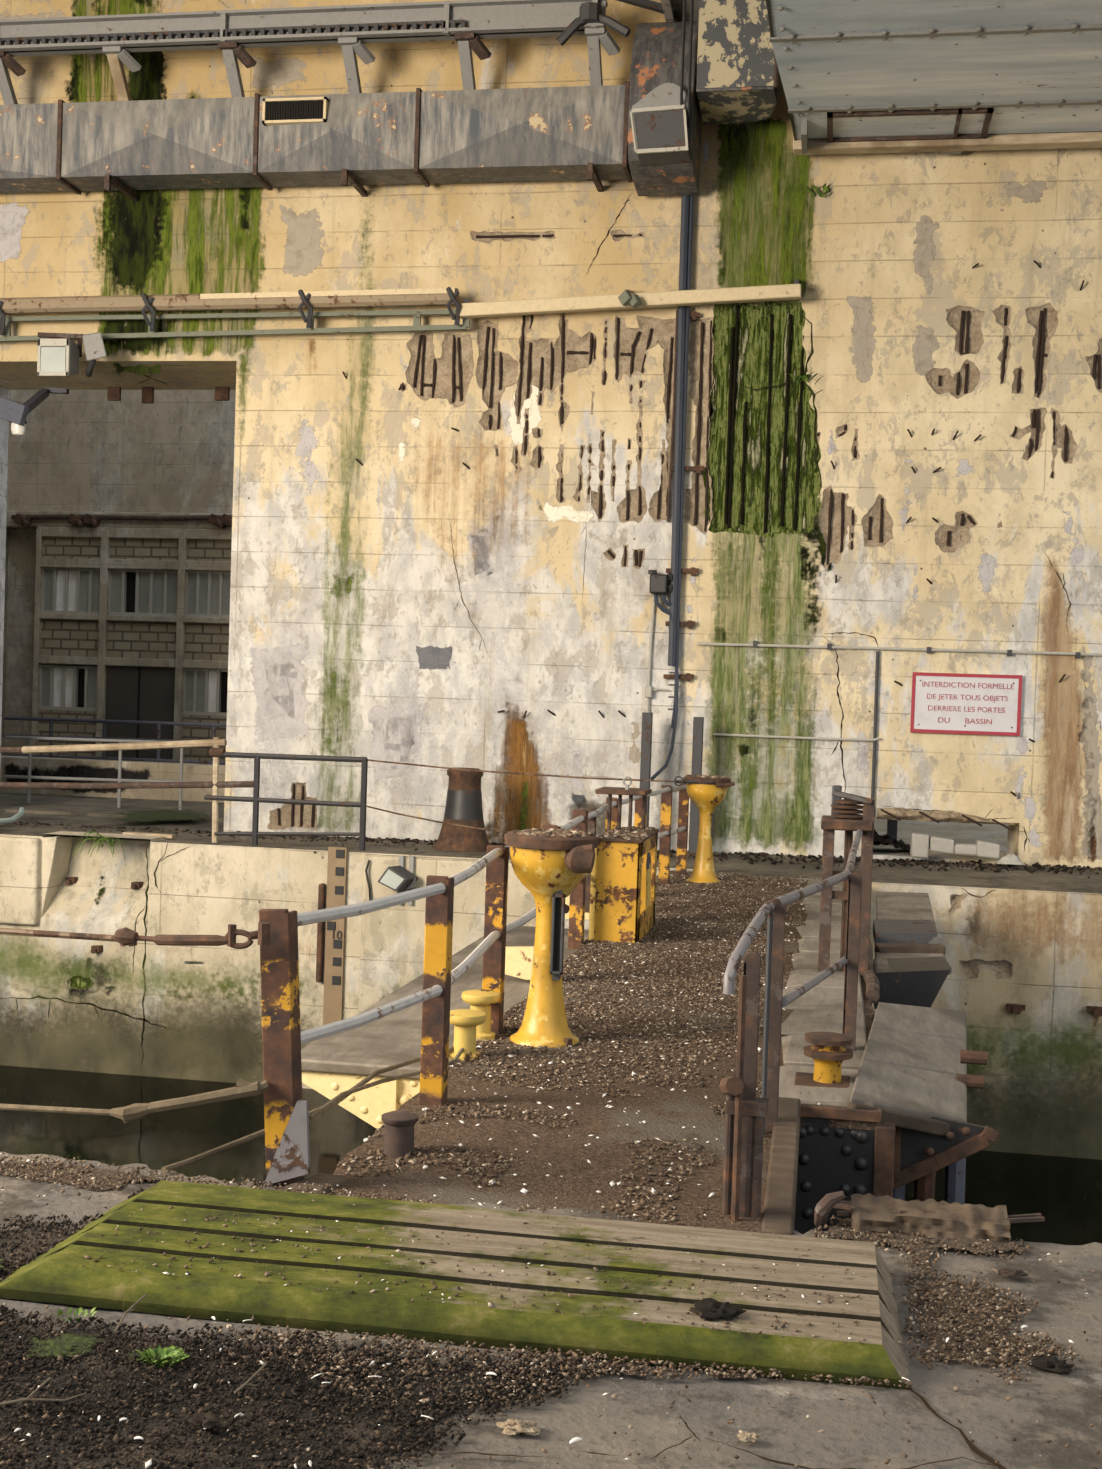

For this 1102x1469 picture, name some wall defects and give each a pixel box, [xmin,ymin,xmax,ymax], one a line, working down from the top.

leakage [128,51,167,101]
leakage [102,190,169,292]
leakage [103,314,175,375]
spalling [912,302,1077,479]
spalling [1085,338,1102,393]
spalling [398,296,911,575]
spalling [935,511,999,592]
rust [487,703,549,844]
leakage [0,945,263,1083]
crack [443,1450,542,1458]
crack [650,1412,858,1469]
crack [901,1388,1006,1469]